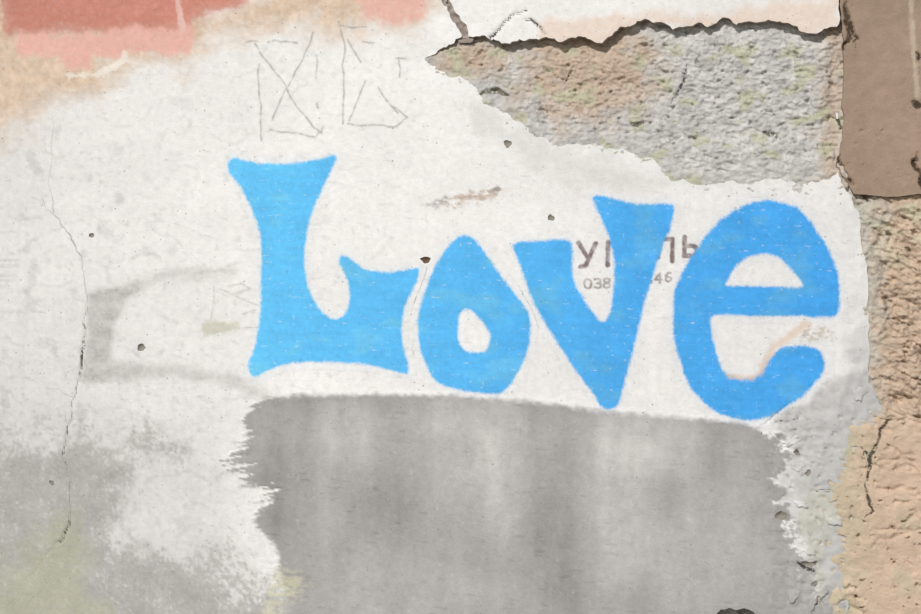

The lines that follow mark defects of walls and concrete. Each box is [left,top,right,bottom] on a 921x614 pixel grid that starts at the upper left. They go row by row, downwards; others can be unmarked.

crack [442,0,547,43]
spalling [416,0,921,423]
crack [910,155,921,189]
crack [5,116,106,614]
flaking render [781,433,815,476]
crack [861,417,895,518]